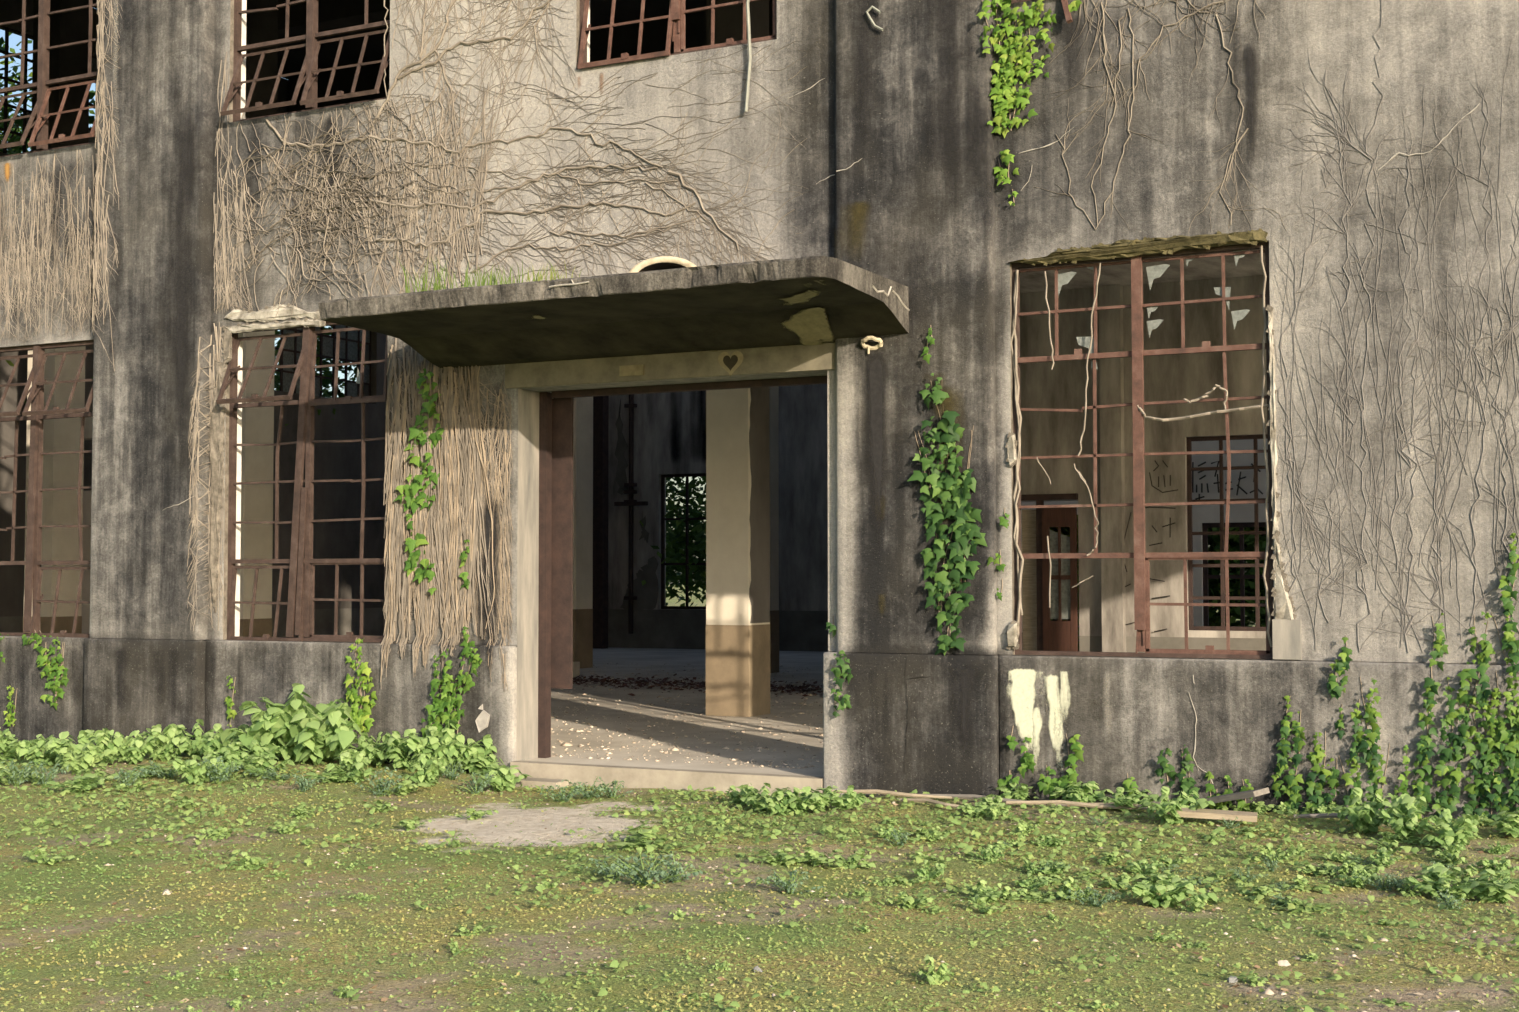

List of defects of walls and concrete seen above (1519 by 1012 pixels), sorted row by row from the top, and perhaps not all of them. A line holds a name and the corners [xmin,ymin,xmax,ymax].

water stain [929,0,980,160]
water stain [167,91,194,418]
peeling [779,280,833,346]
water stain [867,354,885,527]
water stain [938,391,956,454]